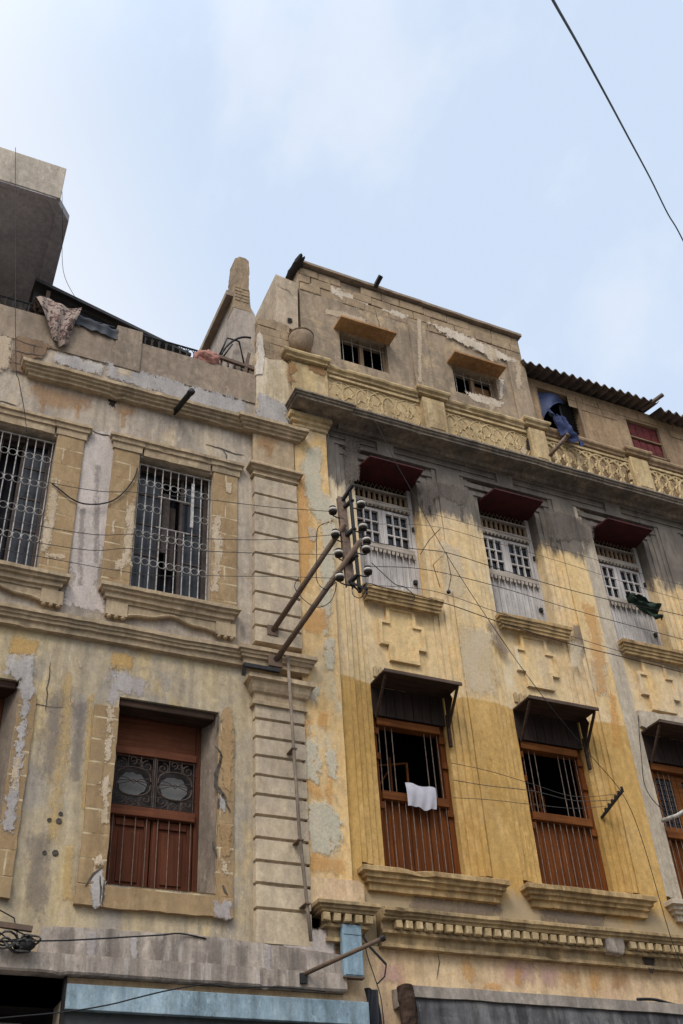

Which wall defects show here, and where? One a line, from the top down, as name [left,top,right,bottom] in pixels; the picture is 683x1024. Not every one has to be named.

flaking render [426,322,522,411]
crack [36,662,66,709]
peeling [0,653,36,834]
peeling [97,668,147,825]
crack [214,712,231,812]
peeling [304,738,339,785]
peeling [307,801,344,855]
spalling [90,851,107,909]